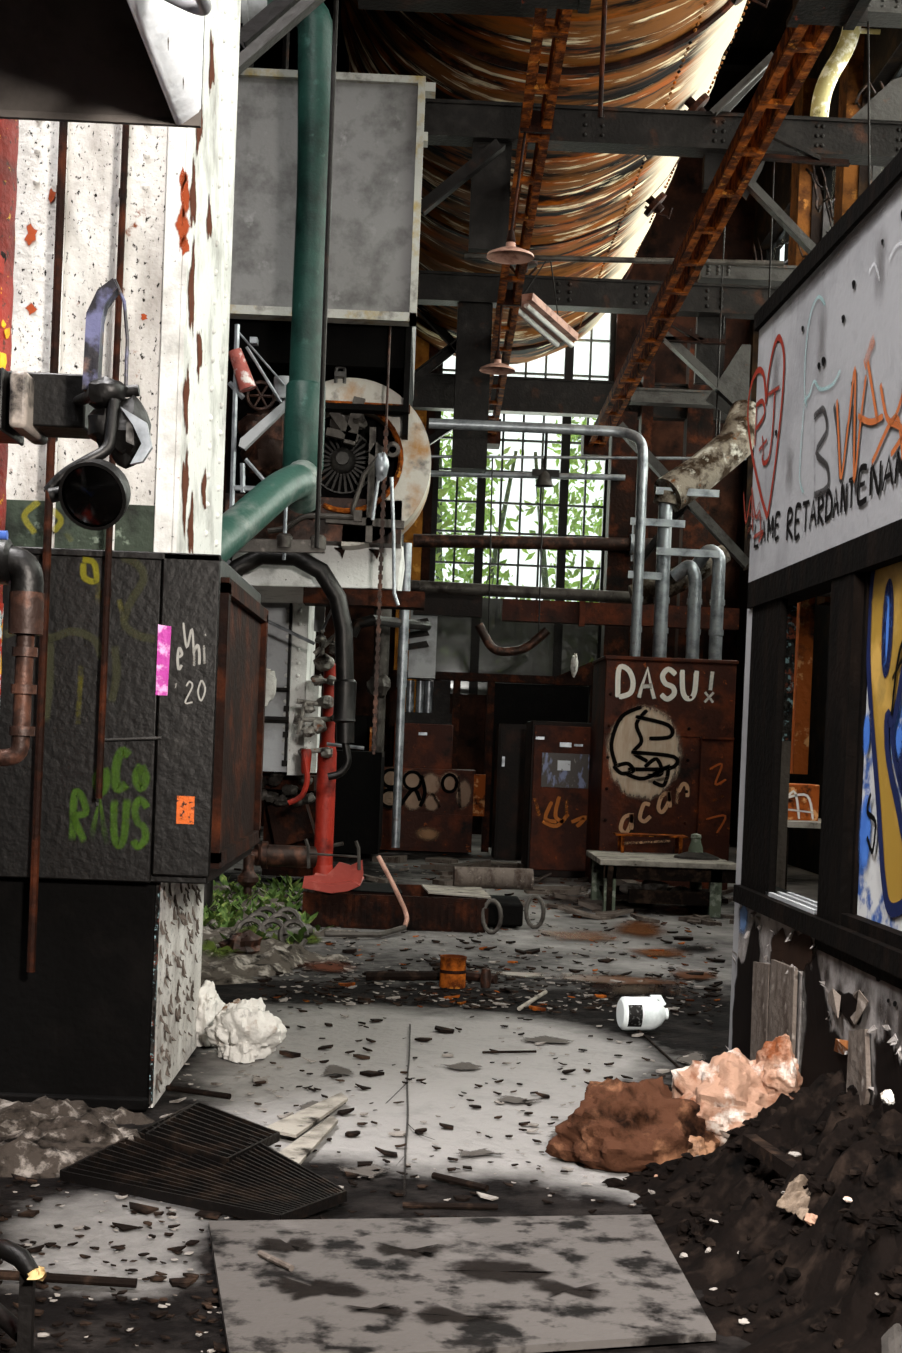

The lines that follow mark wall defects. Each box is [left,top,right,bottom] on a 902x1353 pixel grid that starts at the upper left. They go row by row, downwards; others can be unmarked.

rust [24,223,38,246]
rust [175,167,190,256]
peeling [726,911,902,1114]